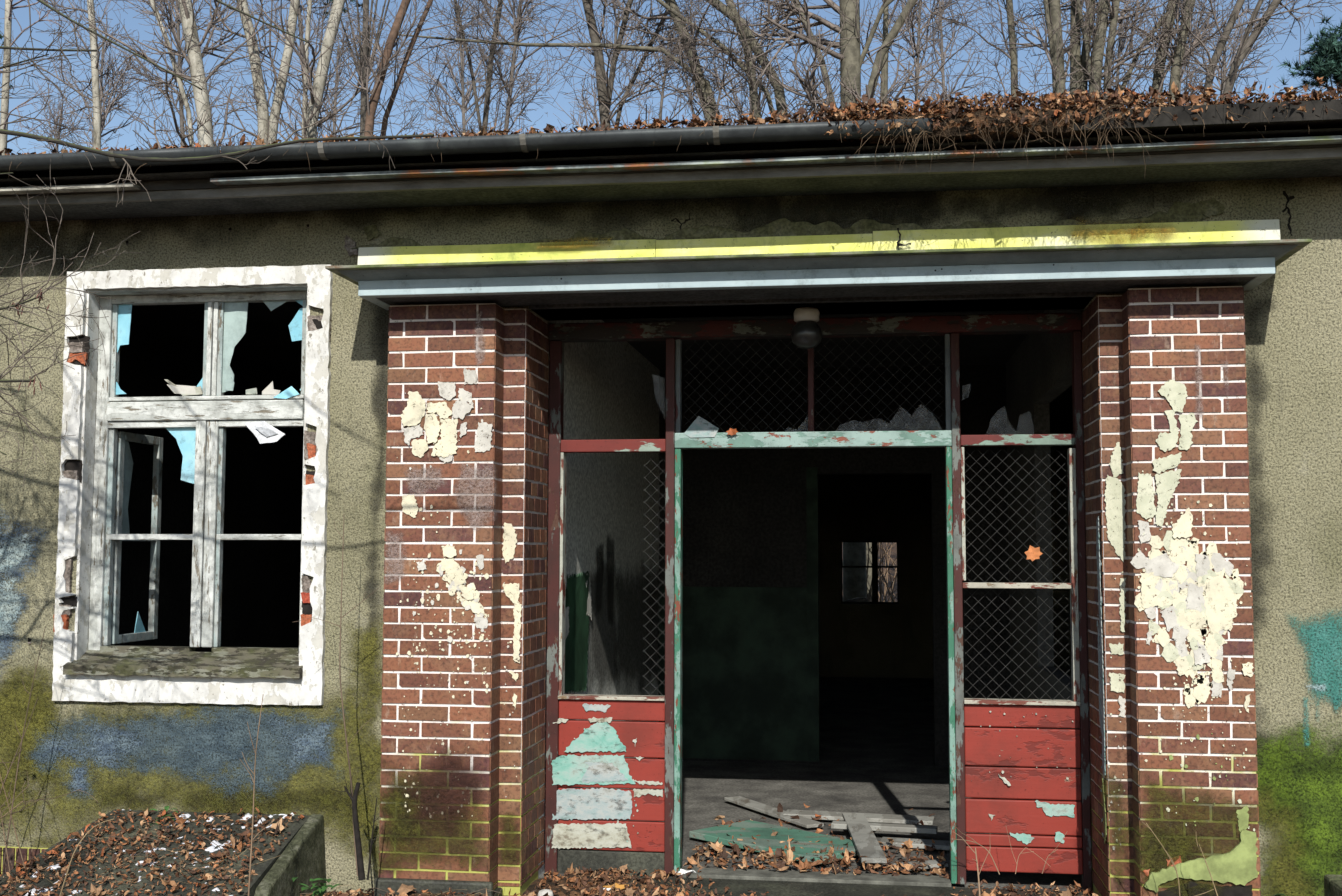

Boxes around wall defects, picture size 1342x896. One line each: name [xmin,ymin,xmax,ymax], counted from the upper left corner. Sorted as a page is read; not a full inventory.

crack [1282,191,1295,236]
peeling [397,368,493,470]
damp [1247,365,1264,401]
damp [1249,492,1269,621]
peeling [394,494,522,812]
peeling [1096,379,1254,850]
peeling [551,571,663,849]
peeling [1010,833,1034,845]
peeling [1035,800,1075,843]
flaking render [1143,799,1258,896]